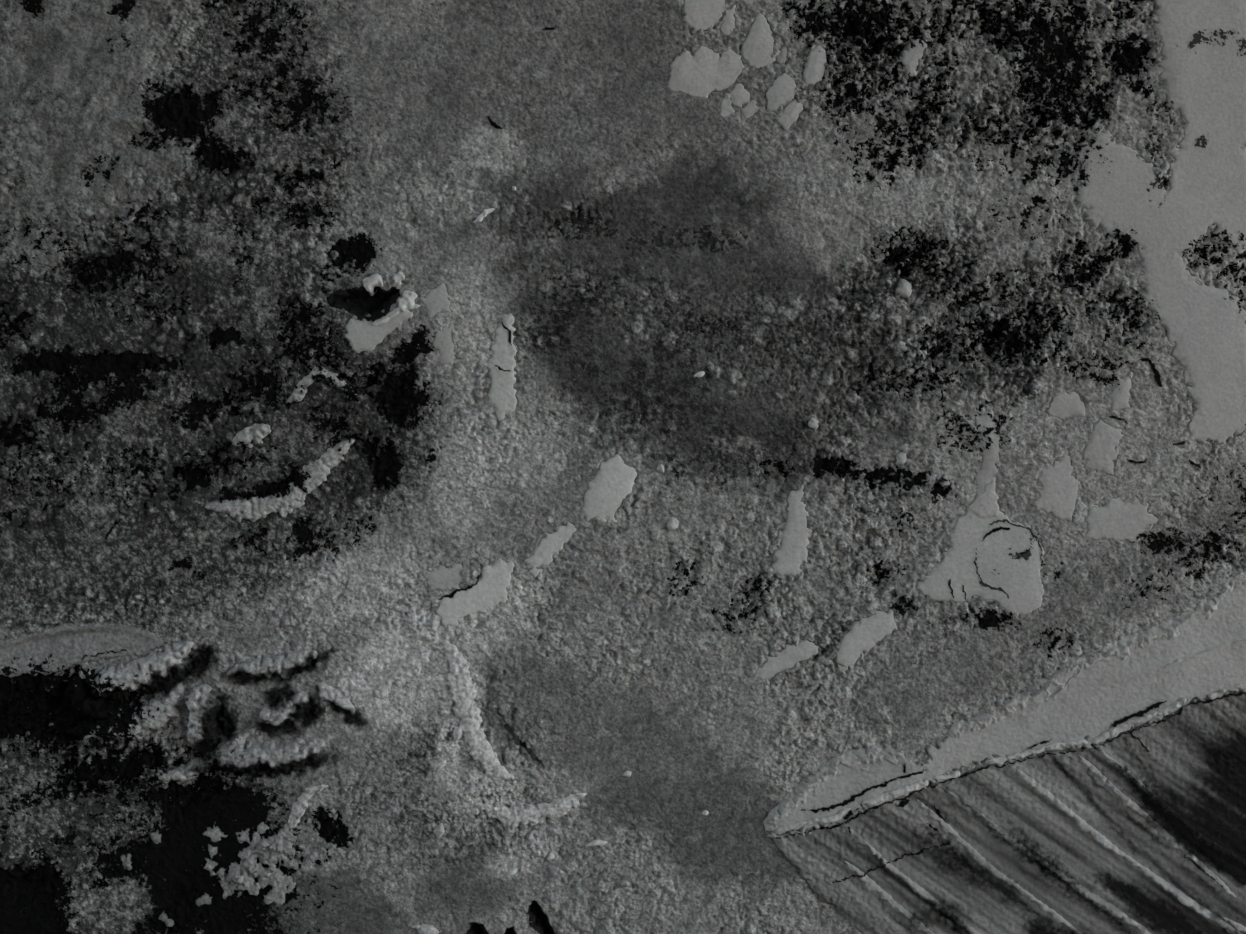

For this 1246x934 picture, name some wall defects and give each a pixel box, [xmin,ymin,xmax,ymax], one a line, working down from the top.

damp [102,0,142,53]
damp [128,0,353,177]
peeling [666,0,827,130]
peeling [1075,0,1246,449]
damp [0,149,447,537]
spalling [326,272,457,366]
peeling [487,313,517,420]
damp [167,555,210,583]
damp [229,514,379,567]
peeling [424,451,637,628]
damp [0,654,355,934]
peeling [764,691,1246,934]